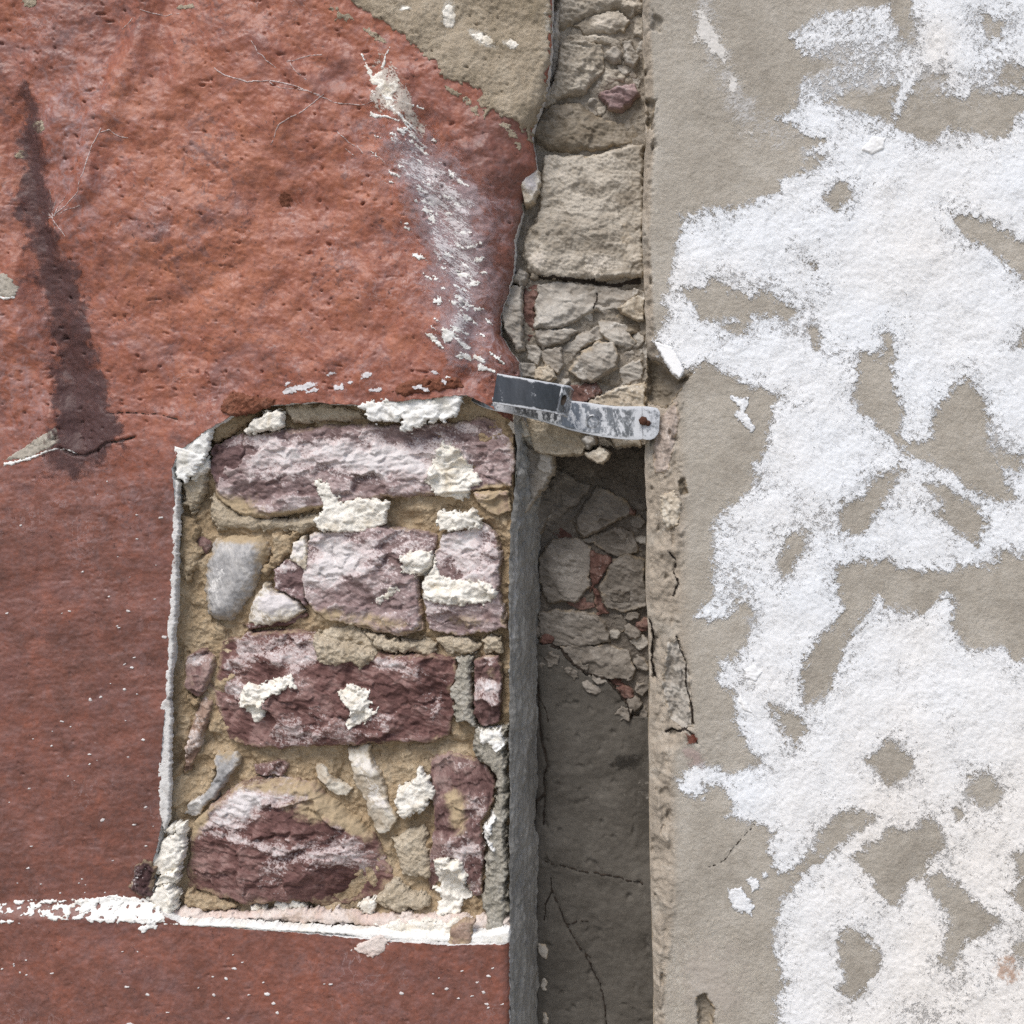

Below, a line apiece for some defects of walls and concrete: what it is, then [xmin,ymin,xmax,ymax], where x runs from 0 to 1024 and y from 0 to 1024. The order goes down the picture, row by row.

peeling [329,0,553,151]
leakage [13,81,124,478]
efflorescence [374,120,505,373]
crack [669,552,679,596]
spalling [0,377,531,943]
crack [551,618,698,744]
crack [544,860,643,1024]
leakage [993,956,1022,983]